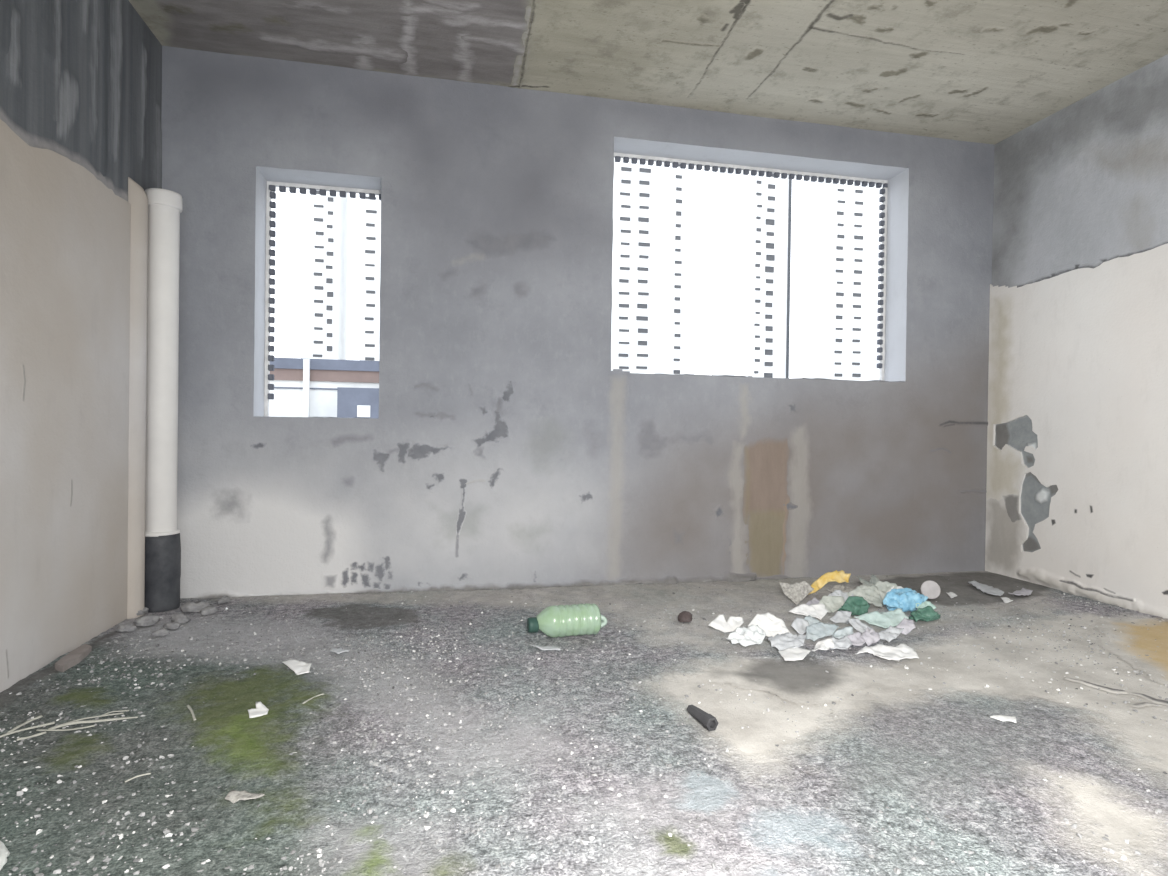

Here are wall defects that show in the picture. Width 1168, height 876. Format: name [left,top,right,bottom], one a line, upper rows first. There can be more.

crack [659,0,754,99]
crack [744,0,969,100]
peeling [0,0,162,201]
spalling [370,438,456,493]
spalling [470,378,519,495]
spalling [576,488,597,507]
peeling [995,415,1058,552]
peeling [320,553,397,591]